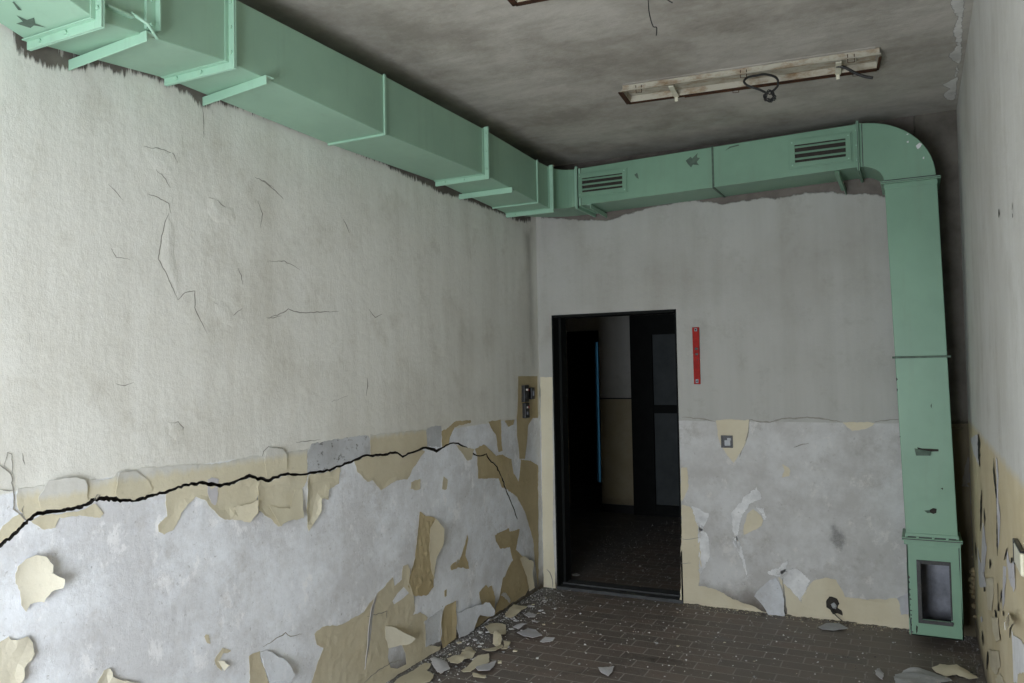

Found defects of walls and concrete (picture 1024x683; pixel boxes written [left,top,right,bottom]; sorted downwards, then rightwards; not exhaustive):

crack [144,146,240,331]
crack [255,177,279,228]
crack [267,309,338,319]
crack [0,440,517,548]
peeling [0,376,556,683]
peeling [682,417,899,463]
peeling [680,467,913,633]
peeling [970,434,979,465]
peeling [968,457,1024,683]